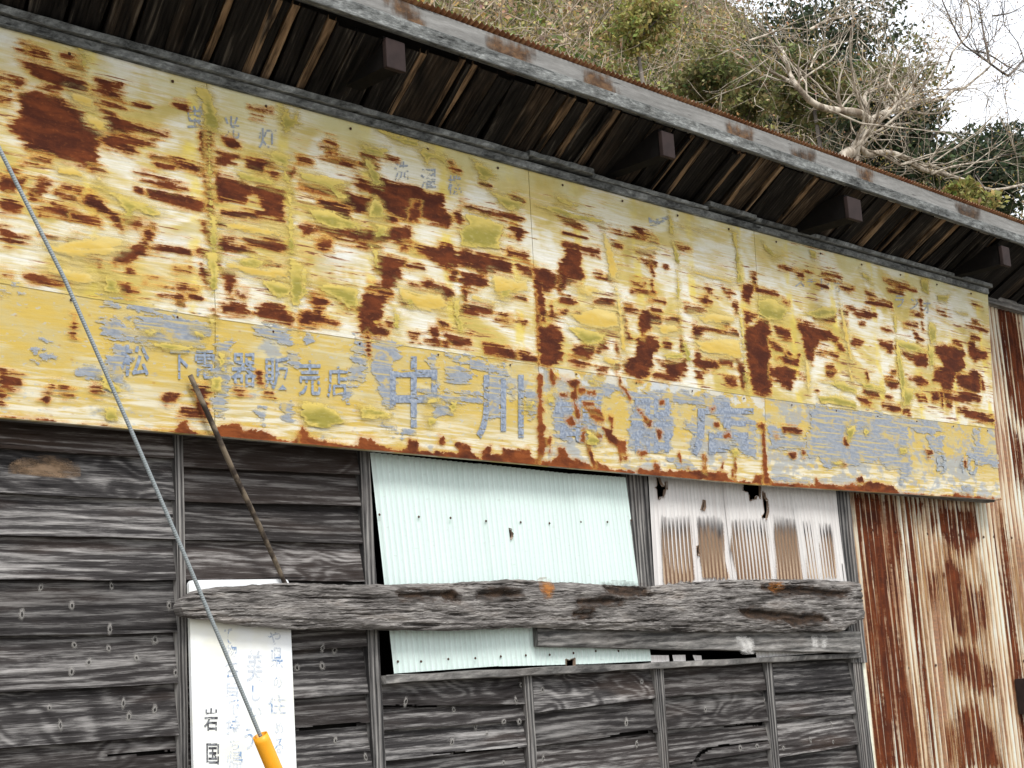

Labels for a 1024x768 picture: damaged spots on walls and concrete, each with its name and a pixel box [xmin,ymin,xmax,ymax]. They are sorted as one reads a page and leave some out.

peeling [71,93,107,130]
peeling [40,236,235,421]
peeling [196,87,359,310]
peeling [252,321,315,369]
peeling [308,129,446,268]
peeling [280,275,528,440]
peeling [460,214,504,249]
corrosion [0,40,1024,493]
peeling [536,196,626,365]
peeling [417,302,946,485]
peeling [654,215,749,390]
corrosion [162,374,1024,768]